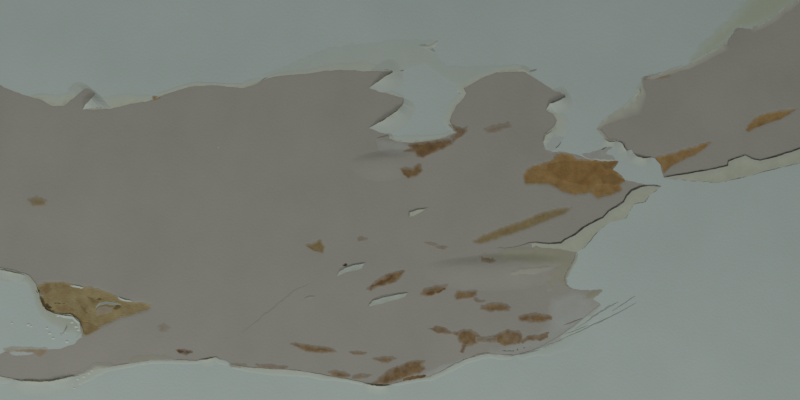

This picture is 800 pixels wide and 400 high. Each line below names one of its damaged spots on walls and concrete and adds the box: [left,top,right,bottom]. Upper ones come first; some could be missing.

peeling [522,0,800,200]
peeling [0,38,660,396]
crack [513,296,635,356]